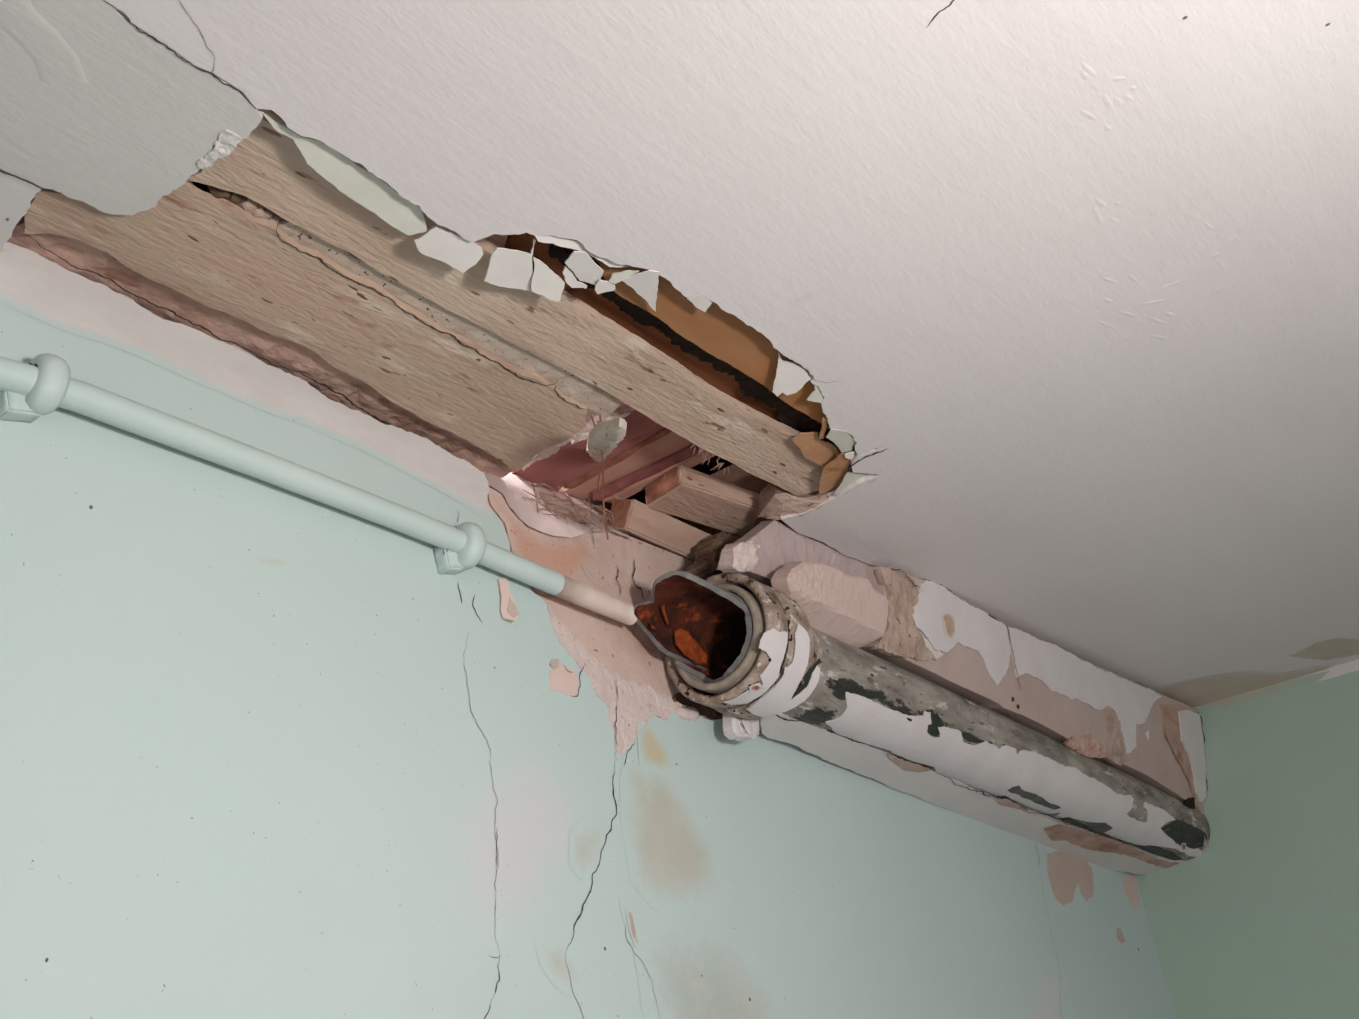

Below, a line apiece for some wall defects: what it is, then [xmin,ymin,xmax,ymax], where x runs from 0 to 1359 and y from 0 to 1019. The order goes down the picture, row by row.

crack [104,0,255,108]
peeling [414,226,659,312]
peeling [687,293,712,312]
peeling [772,352,823,403]
spalling [547,605,687,756]
corrosion [660,603,729,669]
peeling [792,658,822,699]
peeling [907,710,1006,749]
crack [458,584,500,1019]
damp [433,721,787,1019]
crack [565,682,660,1018]
peeling [995,785,1181,910]